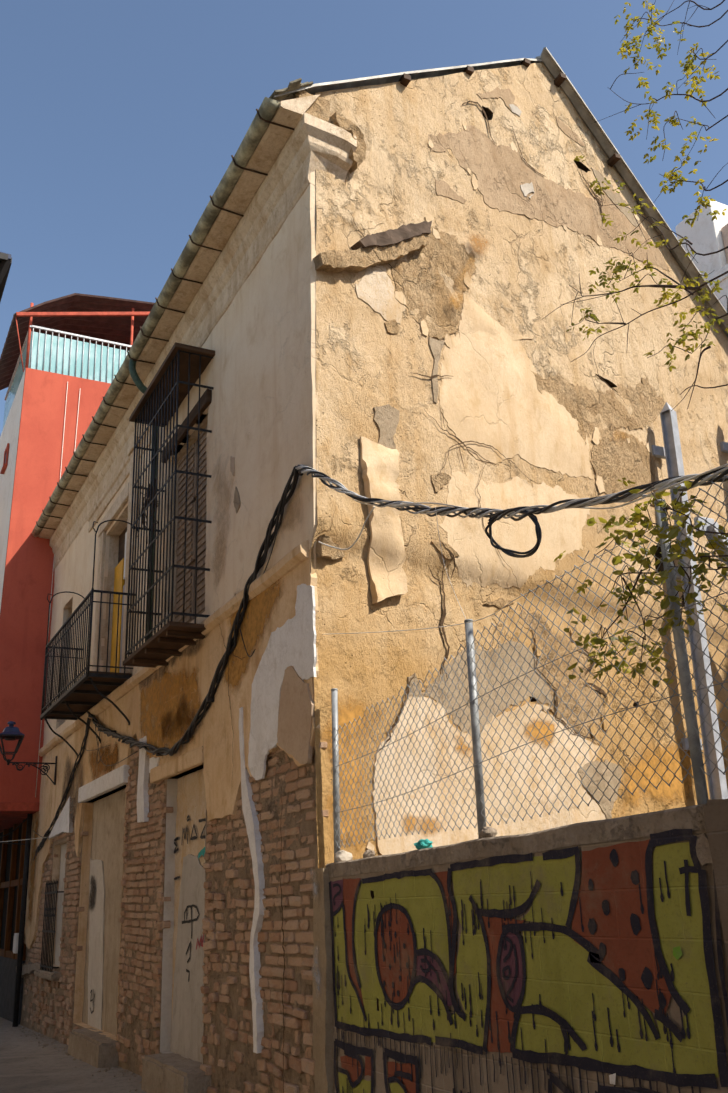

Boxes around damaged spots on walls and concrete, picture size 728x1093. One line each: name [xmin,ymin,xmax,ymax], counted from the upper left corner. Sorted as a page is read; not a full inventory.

peeling [428,87,670,272]
spalling [355,214,476,403]
peeling [373,404,400,449]
spalling [431,473,451,492]
crack [410,372,538,591]
spalling [531,371,664,505]
leakage [139,639,200,758]
peeling [366,597,622,855]
crack [518,621,608,746]
flaking render [22,817,88,1045]
flaking render [115,740,173,1076]
flaking render [200,666,329,1093]